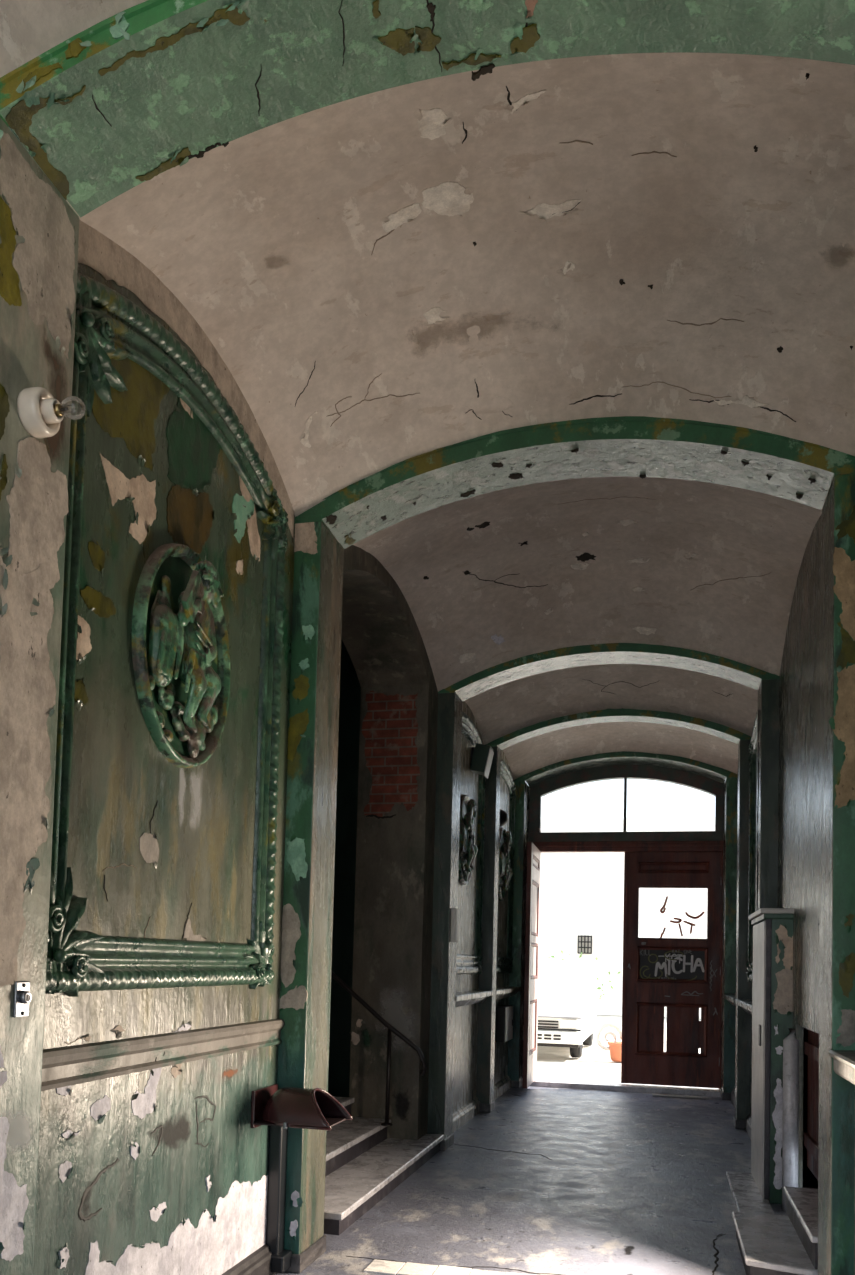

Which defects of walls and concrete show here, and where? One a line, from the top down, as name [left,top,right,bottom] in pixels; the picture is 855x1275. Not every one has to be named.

peeling [0,38,92,359]
peeling [135,142,229,182]
crack [326,373,418,417]
crack [625,381,750,398]
peeling [92,358,222,554]
peeling [231,476,261,578]
peeling [829,505,855,812]
spalling [0,437,69,987]
spalling [0,1116,29,1262]
spalling [85,1174,268,1275]
crack [347,1256,562,1275]
crack [712,1234,726,1275]